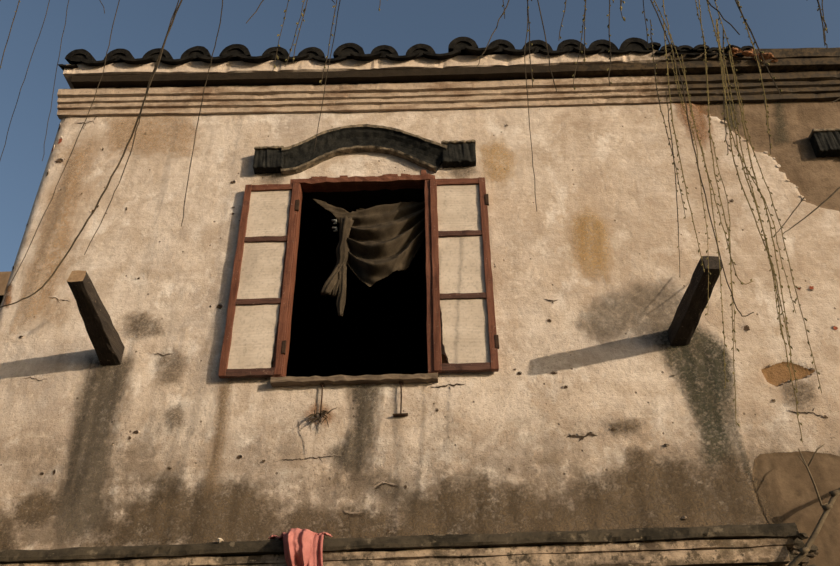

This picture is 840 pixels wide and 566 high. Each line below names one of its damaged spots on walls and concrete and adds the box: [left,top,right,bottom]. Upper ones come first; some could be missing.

spalling [696,101,840,212]
spalling [761,362,815,387]
crack [276,422,343,462]
water stain [0,287,777,550]
crack [566,430,598,441]
crack [788,408,823,416]